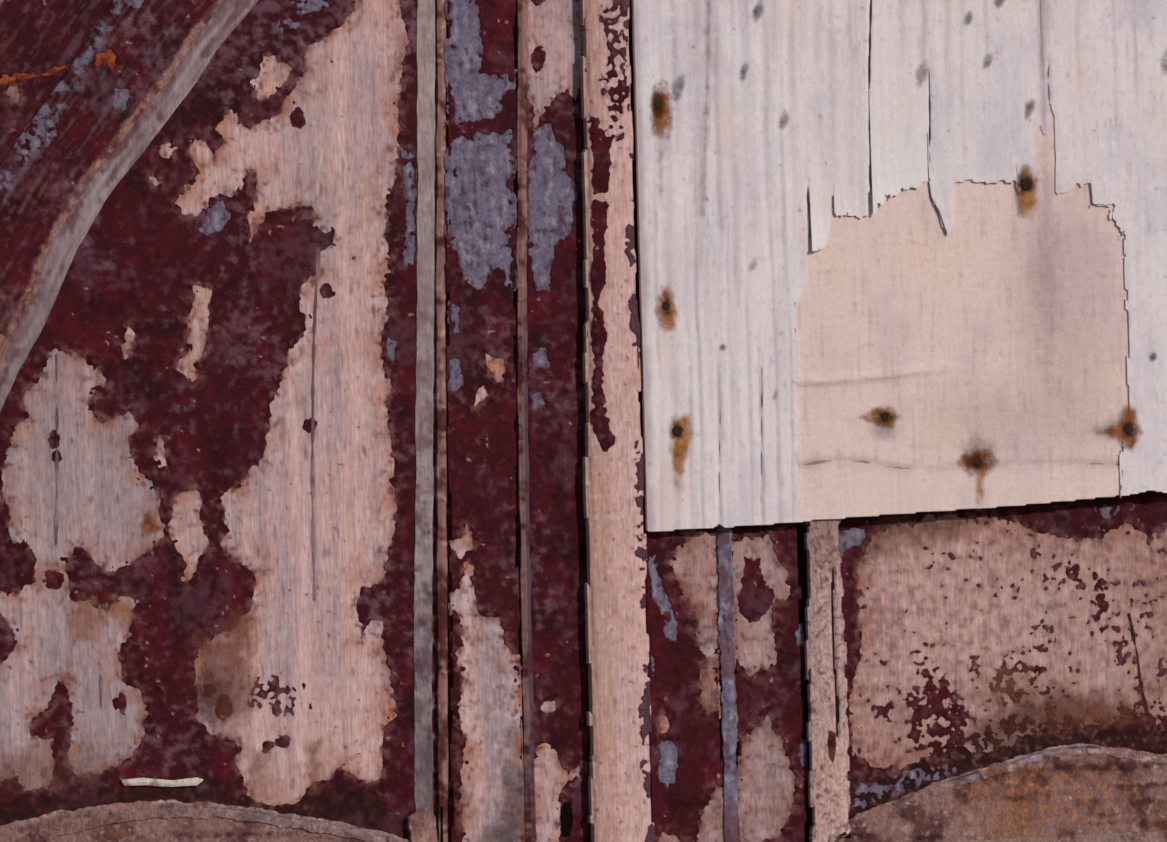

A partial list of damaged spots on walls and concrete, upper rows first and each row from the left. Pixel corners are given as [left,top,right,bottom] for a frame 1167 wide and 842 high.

peeling [0,0,417,806]
peeling [444,0,583,291]
peeling [448,524,581,842]
peeling [587,0,630,452]
rust [652,92,672,134]
rust [657,289,676,329]
rust [672,417,691,473]
peeling [635,440,790,719]
crack [866,0,874,184]
rust [960,448,994,496]
peeling [838,504,1167,808]
rust [1106,407,1140,448]